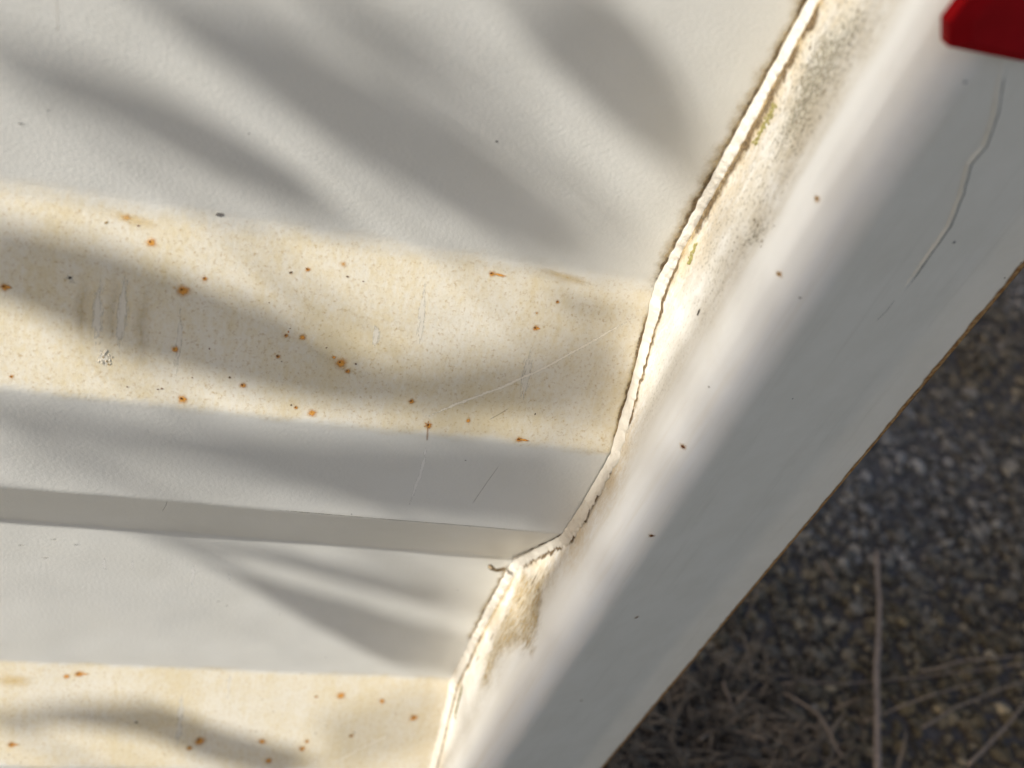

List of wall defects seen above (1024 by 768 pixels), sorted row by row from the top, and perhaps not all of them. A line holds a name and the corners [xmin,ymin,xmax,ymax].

water stain [774,9,865,151]
crack [895,57,1009,298]